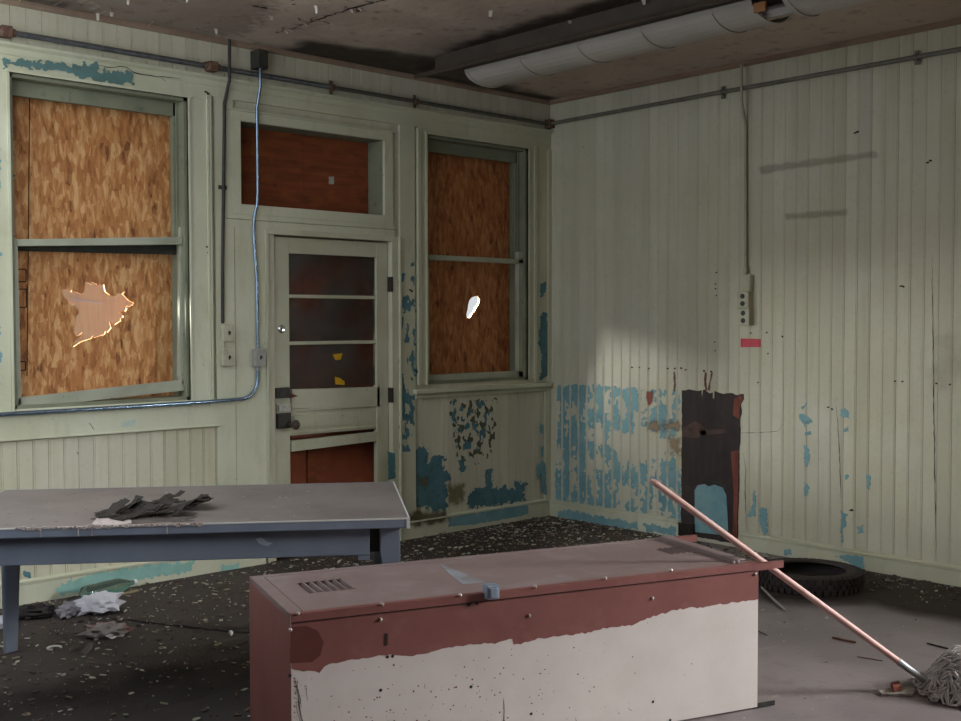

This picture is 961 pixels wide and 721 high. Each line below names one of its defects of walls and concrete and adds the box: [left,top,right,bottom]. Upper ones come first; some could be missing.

crack [276,0,385,34]
peeling [2,57,135,87]
peeling [387,262,681,536]
peeling [55,560,195,596]